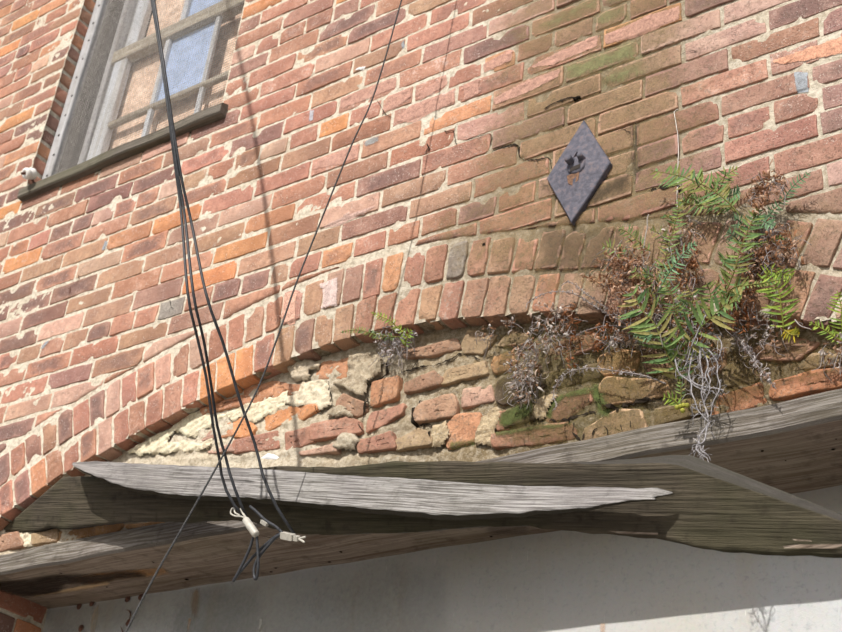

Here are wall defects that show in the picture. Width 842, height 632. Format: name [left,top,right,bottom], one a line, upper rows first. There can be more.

crack [544,96,581,109]
crack [647,183,681,192]